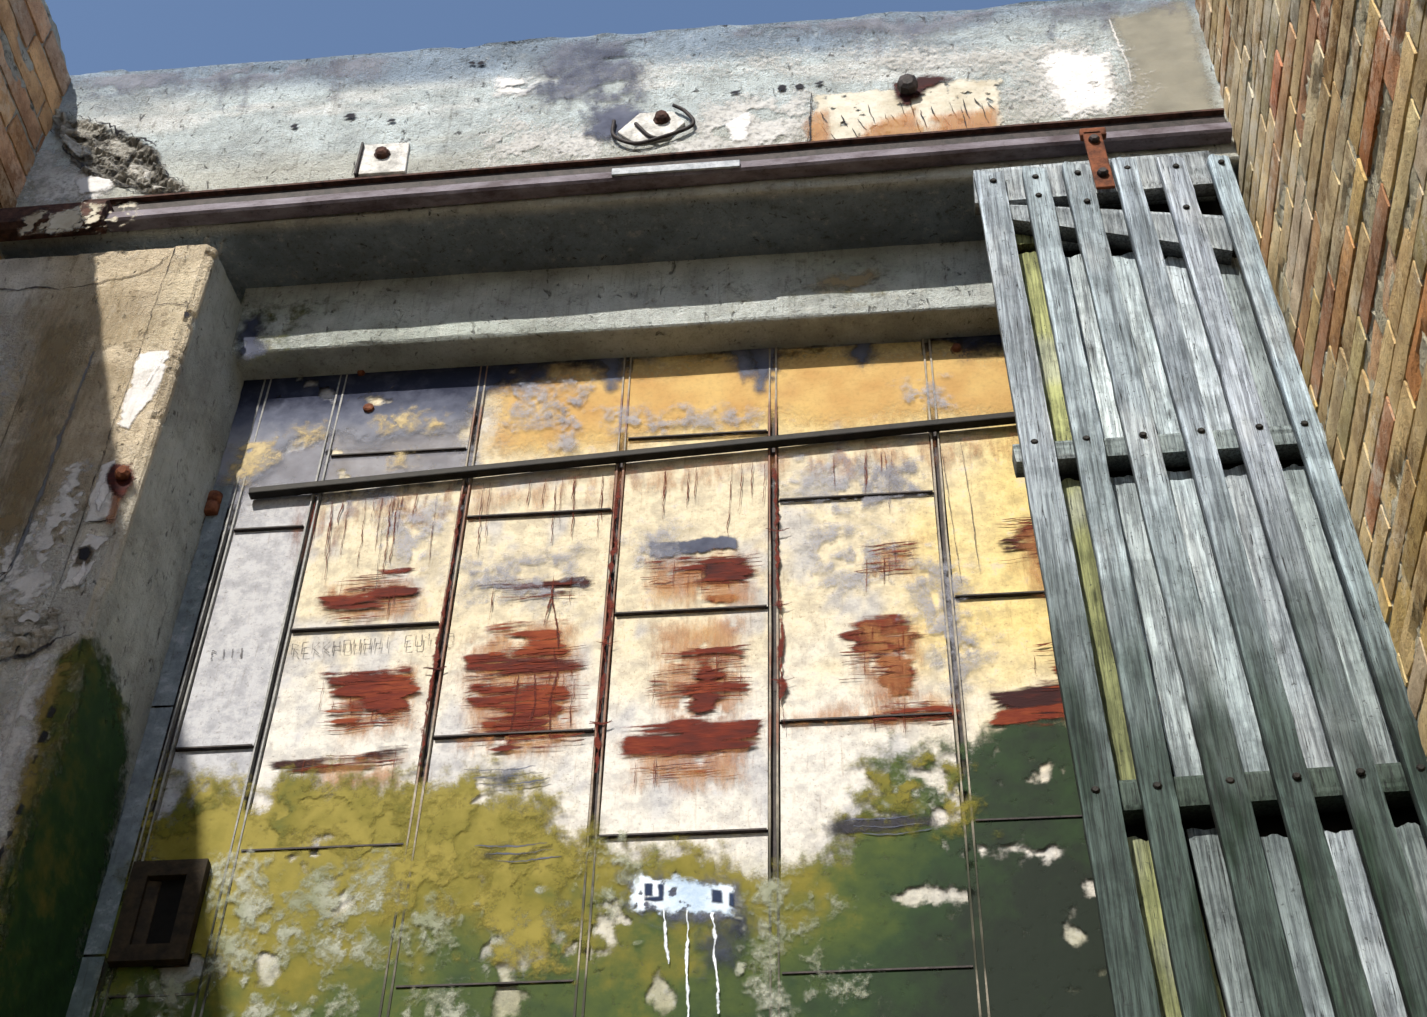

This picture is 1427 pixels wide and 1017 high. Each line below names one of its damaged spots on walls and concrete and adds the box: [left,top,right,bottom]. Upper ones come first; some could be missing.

spalling [19,108,188,235]
damp [475,36,662,167]
damp [777,11,1144,124]
crack [0,247,184,582]
peeling [61,460,115,589]
damp [0,645,55,840]
crack [0,627,73,662]
rust [269,483,491,785]
rust [456,474,621,773]
rust [621,622,762,789]
rust [820,614,959,734]
peeling [204,853,463,1017]